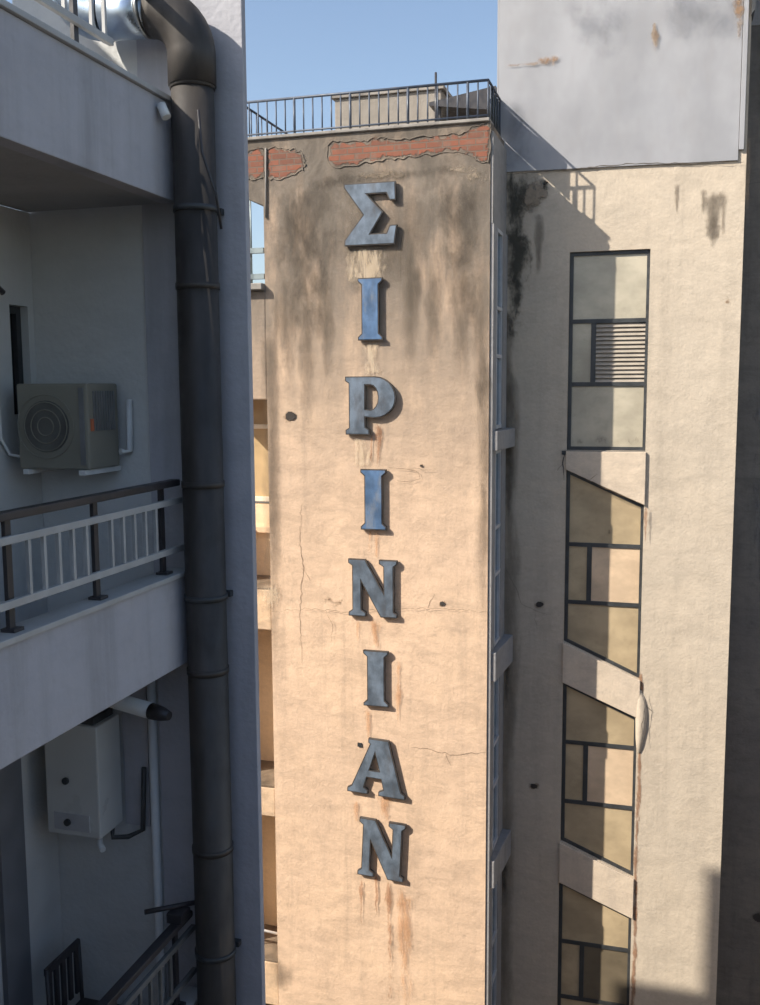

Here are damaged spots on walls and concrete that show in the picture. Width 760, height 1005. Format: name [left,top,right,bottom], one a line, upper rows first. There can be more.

flaking render [248,146,307,181]
flaking render [327,122,492,180]
water stain [355,249,379,278]
water stain [506,176,547,335]